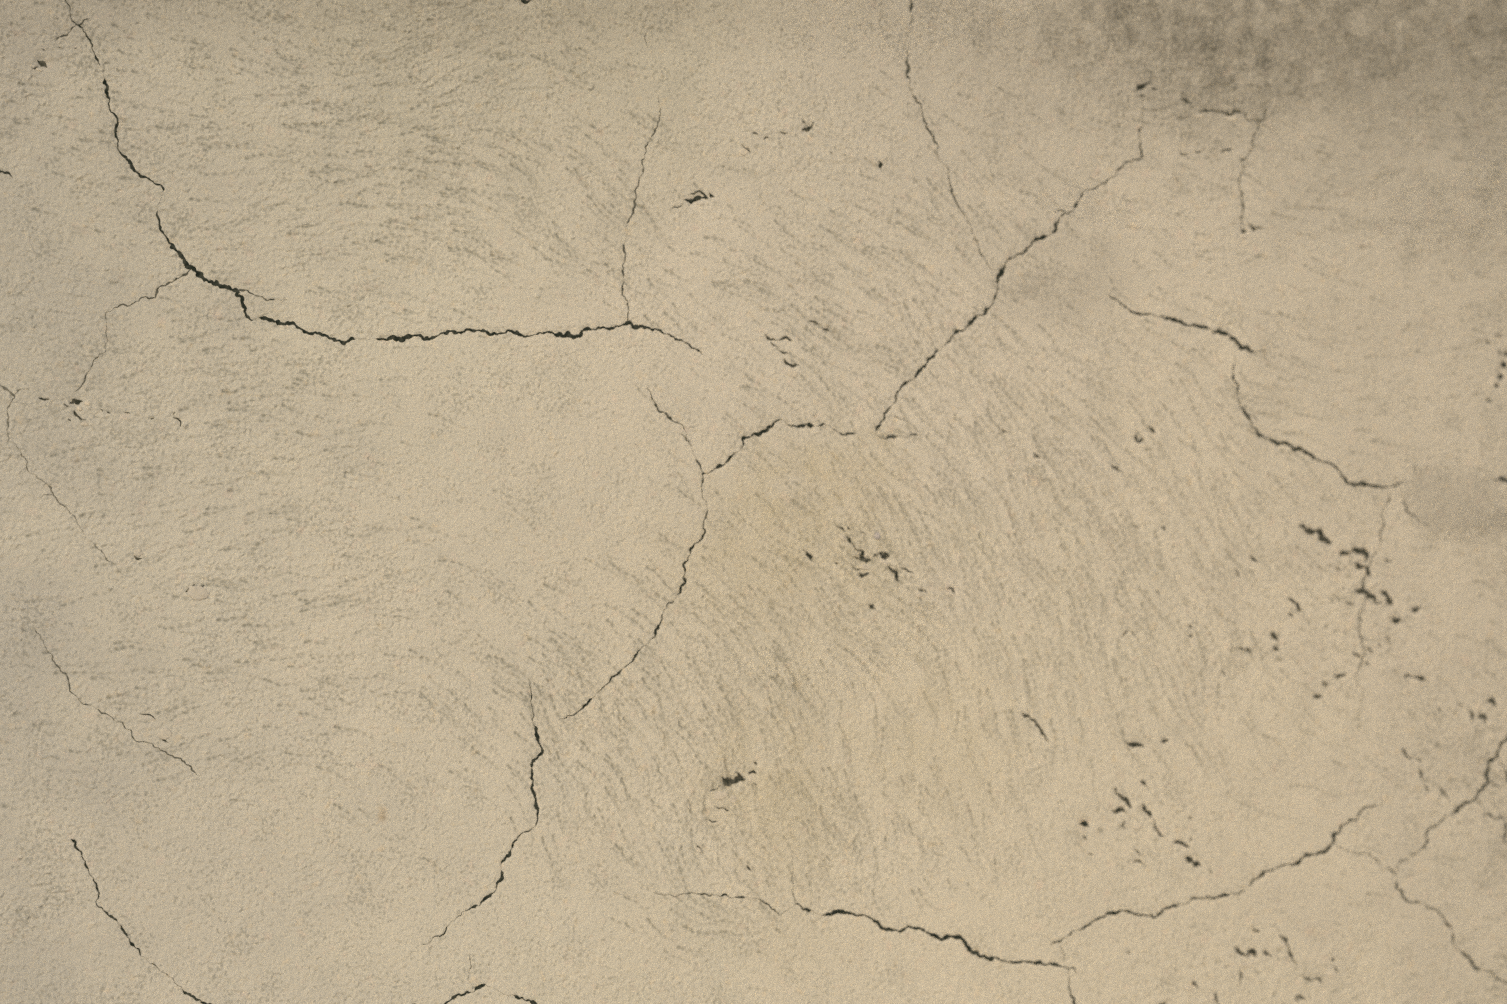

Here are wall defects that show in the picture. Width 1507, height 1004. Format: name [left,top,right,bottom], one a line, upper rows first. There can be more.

crack [53,0,702,391]
crack [1238,108,1267,225]
crack [0,385,118,570]
crack [414,0,1144,1004]
crack [1109,295,1430,725]
crack [35,630,197,775]
crack [71,839,212,1004]
crack [657,737,1507,1004]